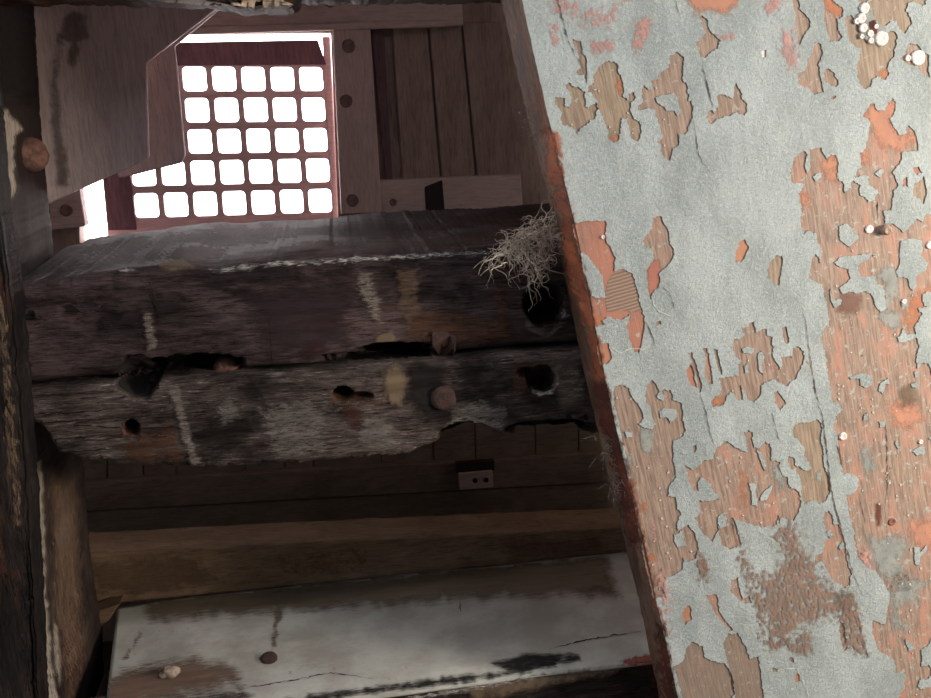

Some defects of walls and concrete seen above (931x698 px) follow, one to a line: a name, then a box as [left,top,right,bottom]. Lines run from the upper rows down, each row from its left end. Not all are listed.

peeling [687,0,739,58]
peeling [764,0,930,99]
water stain [0,4,543,272]
peeling [555,39,694,161]
peeling [706,83,748,124]
peeling [573,216,675,353]
peeling [597,343,612,365]
peeling [613,98,931,698]
crack [801,306,862,593]
water stain [108,633,251,698]
water stain [306,653,623,698]
crack [551,631,640,649]